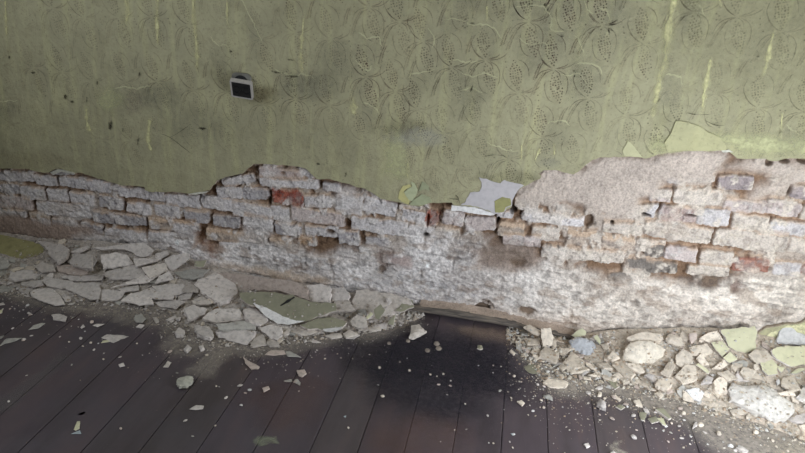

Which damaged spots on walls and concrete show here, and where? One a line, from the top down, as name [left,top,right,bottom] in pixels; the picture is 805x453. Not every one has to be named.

flaking render [0,121,805,333]